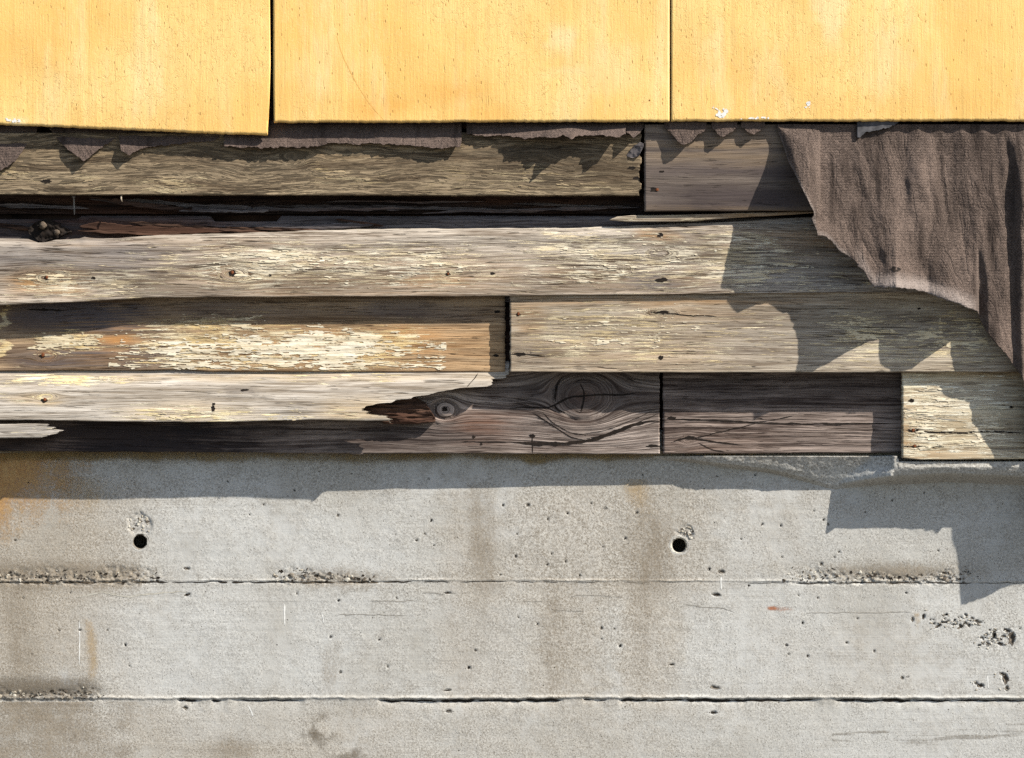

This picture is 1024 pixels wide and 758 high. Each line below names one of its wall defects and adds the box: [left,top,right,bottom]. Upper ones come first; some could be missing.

peeling [857,121,898,138]
peeling [561,235,814,283]
peeling [27,332,103,356]
peeling [93,314,447,381]
peeling [825,309,1003,362]
peeling [153,409,227,420]